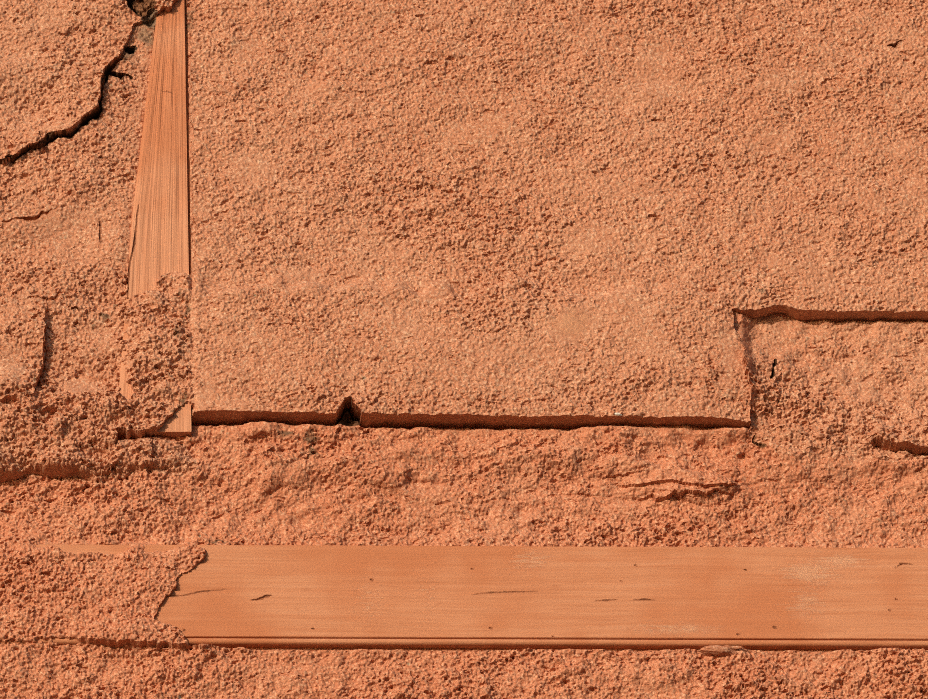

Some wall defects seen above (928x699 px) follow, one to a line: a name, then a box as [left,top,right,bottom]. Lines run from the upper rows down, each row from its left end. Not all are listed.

peeling [154,0,178,14]
crack [0,53,132,164]